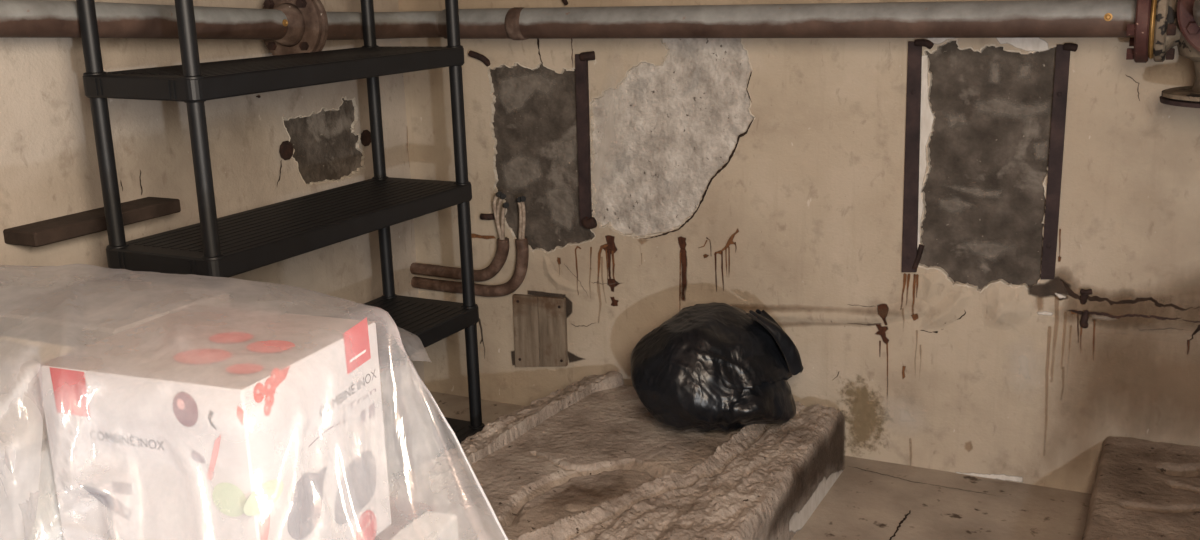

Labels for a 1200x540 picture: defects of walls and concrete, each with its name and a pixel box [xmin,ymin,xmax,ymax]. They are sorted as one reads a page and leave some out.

flaking render [282,96,366,186]
flaking render [487,38,755,253]
flaking render [917,38,1057,293]
corrosion [557,235,619,306]
corrosion [678,229,739,307]
corrosion [875,273,919,395]
crack [1060,279,1200,340]